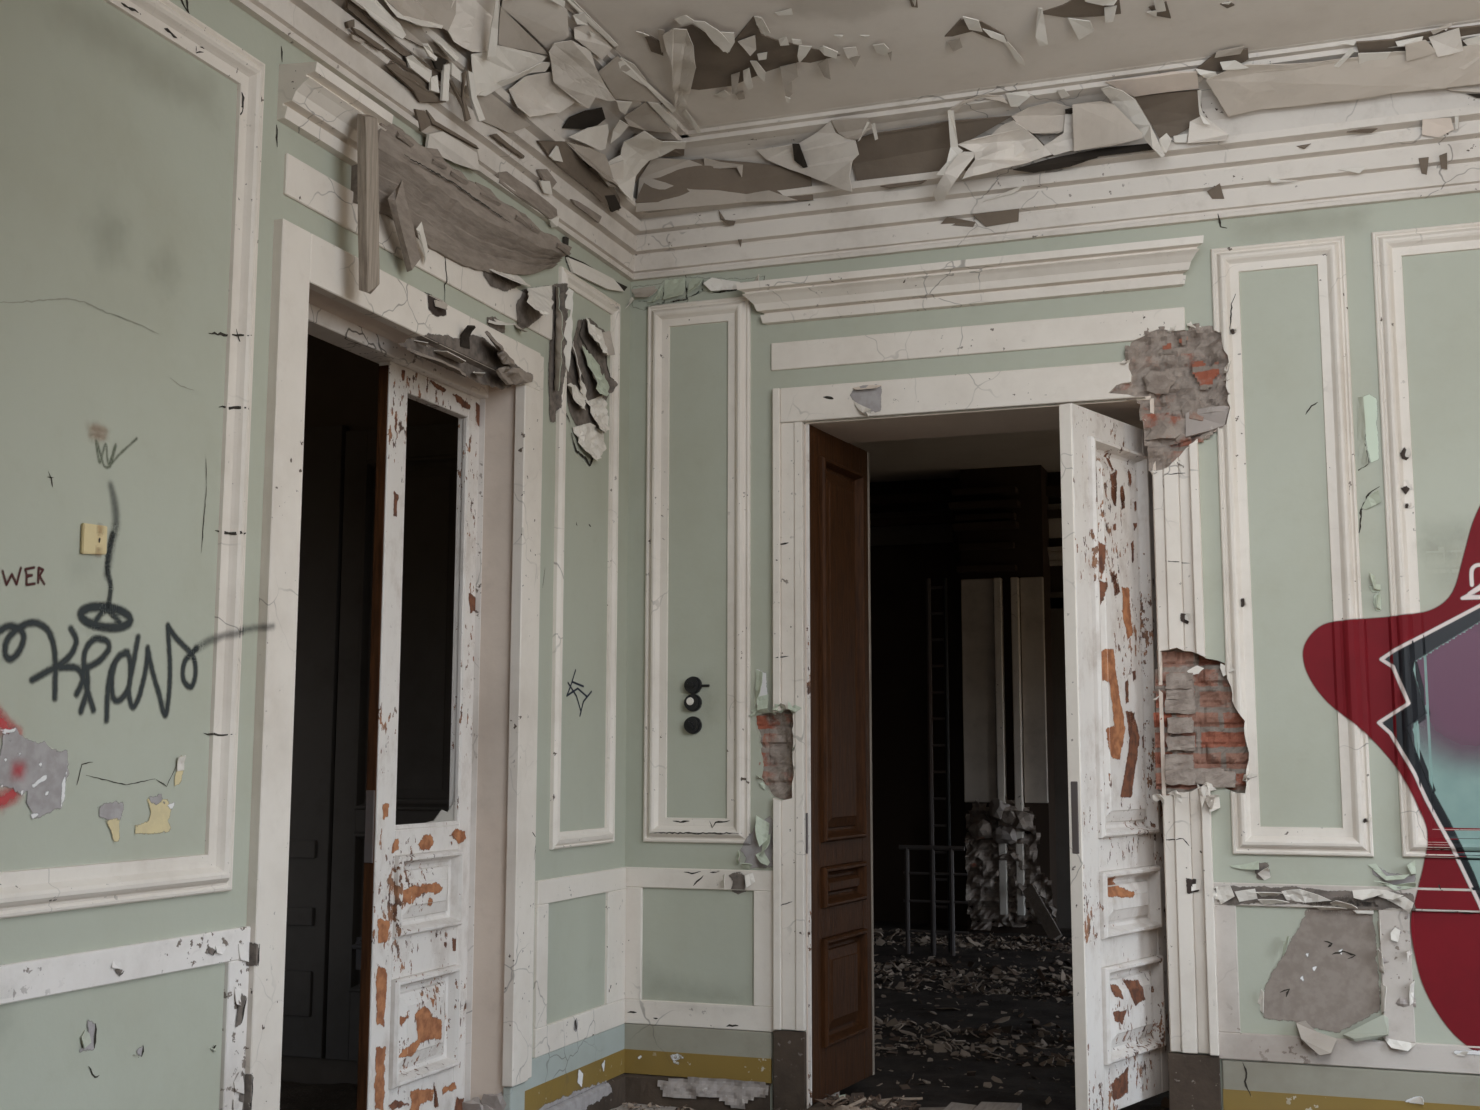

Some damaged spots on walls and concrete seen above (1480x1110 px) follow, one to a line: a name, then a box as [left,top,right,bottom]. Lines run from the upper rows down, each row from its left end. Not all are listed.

peeling [384,0,1480,212]
peeling [973,209,1019,227]
peeling [399,269,618,466]
flaking render [1110,322,1237,476]
flaking render [0,727,69,819]
flaking render [99,755,186,842]
peeling [720,815,773,894]
flaking render [749,669,801,800]
flaking render [1152,649,1257,812]
flaking render [1186,861,1416,1056]
flaking render [539,1060,612,1110]
flaking render [657,1054,769,1109]